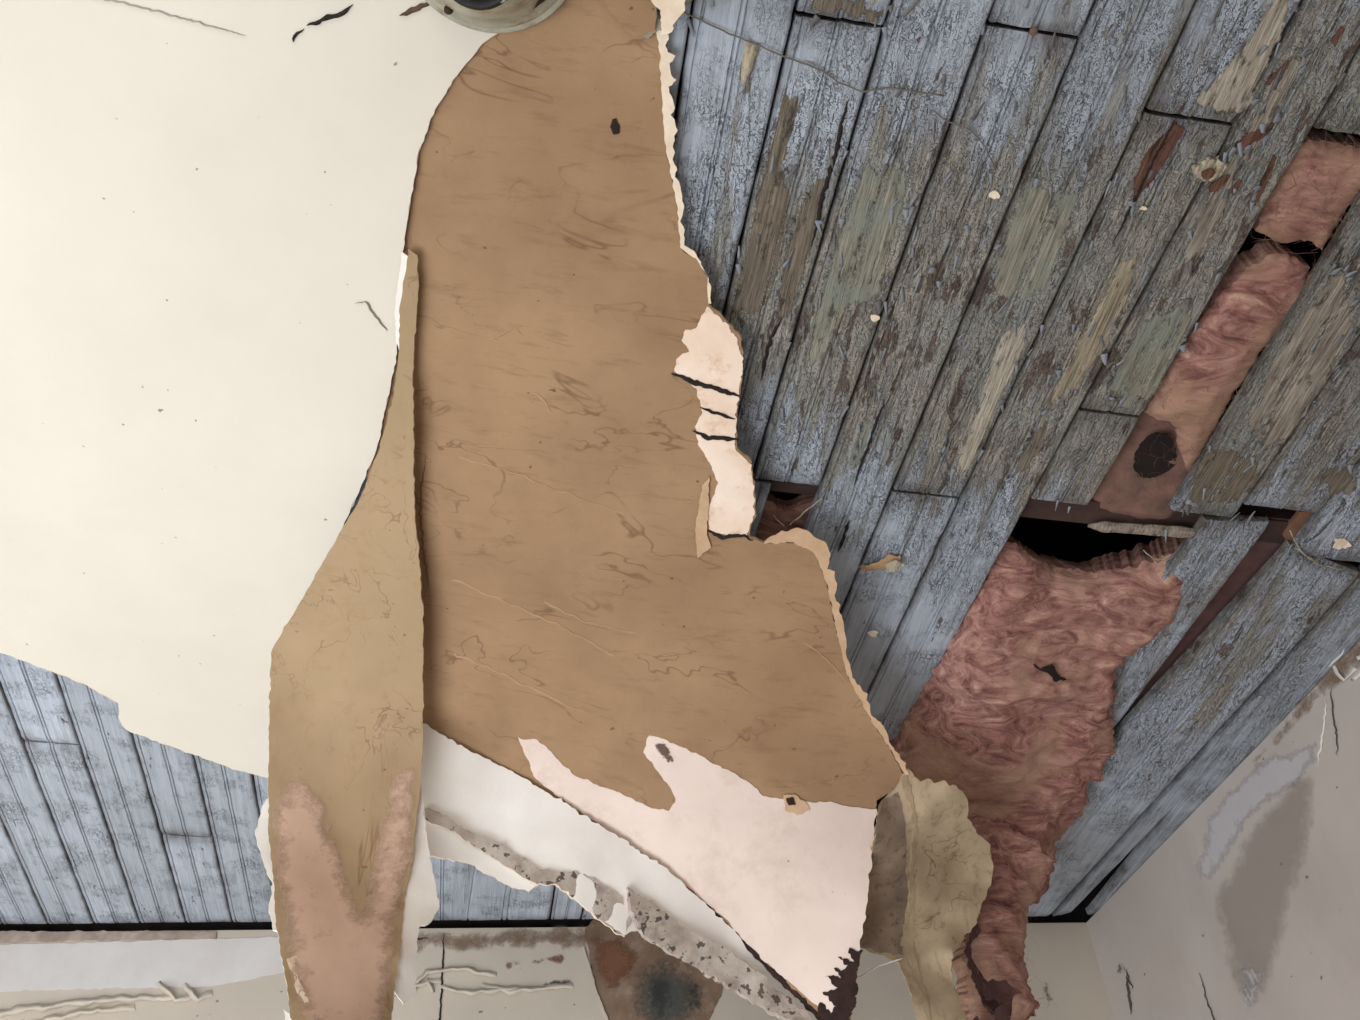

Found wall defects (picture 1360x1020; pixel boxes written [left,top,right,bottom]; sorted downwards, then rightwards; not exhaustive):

crack [104,0,244,36]
crack [292,5,353,42]
peeling [739,42,760,94]
peeling [1104,0,1328,284]
peeling [1330,26,1360,47]
spalling [674,81,961,558]
peeling [922,160,1199,495]
peeling [1180,240,1360,522]
peeling [0,772,813,1020]
crack [1200,976,1215,1020]